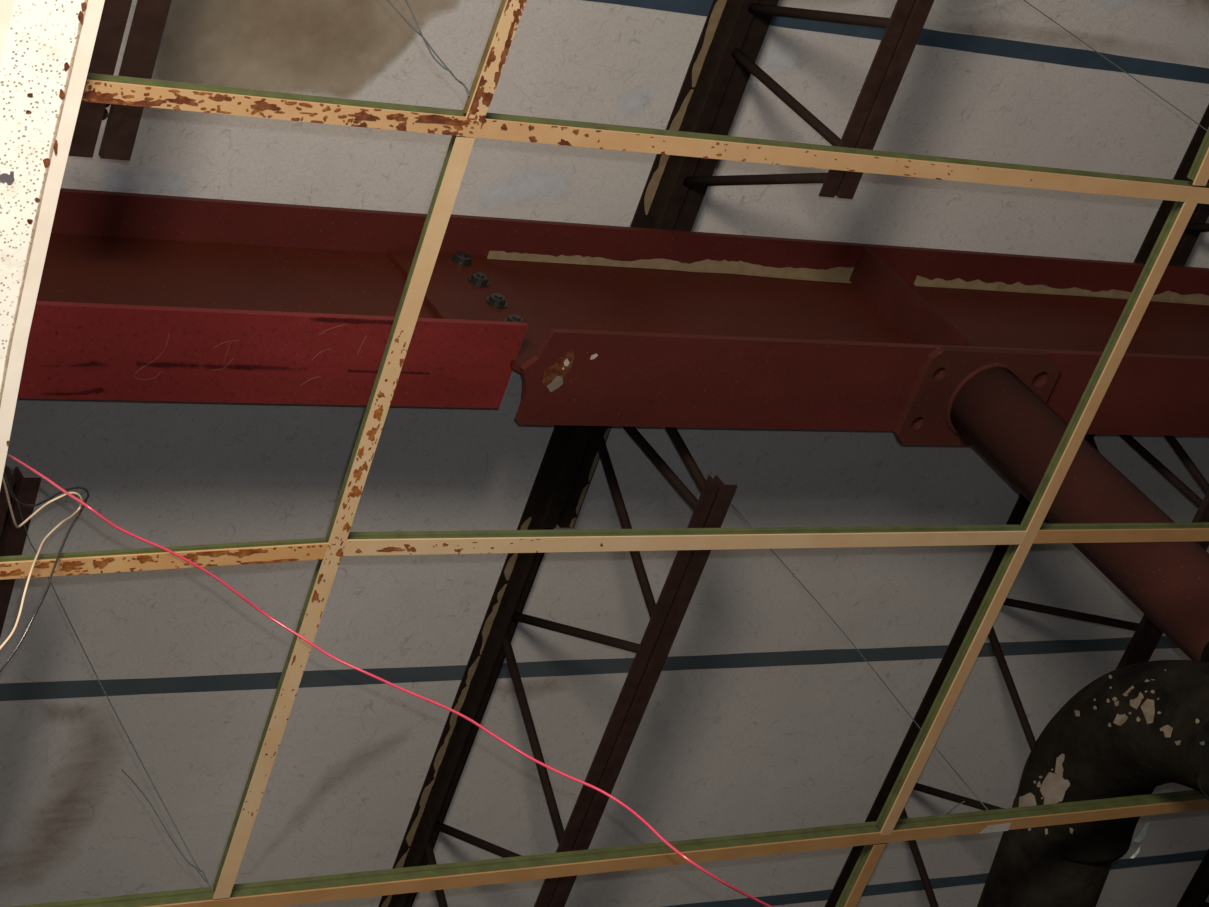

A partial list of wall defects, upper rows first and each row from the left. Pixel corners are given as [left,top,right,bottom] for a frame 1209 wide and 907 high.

leakage [157,0,453,96]
rust [81,0,537,142]
rust [551,126,603,149]
rust [0,0,88,406]
peeling [487,251,854,283]
peeling [914,275,1131,299]
peeling [1150,291,1209,305]
rust [0,318,429,639]
peeling [395,553,518,868]
peeling [1074,669,1181,745]
peeling [1019,754,1070,807]